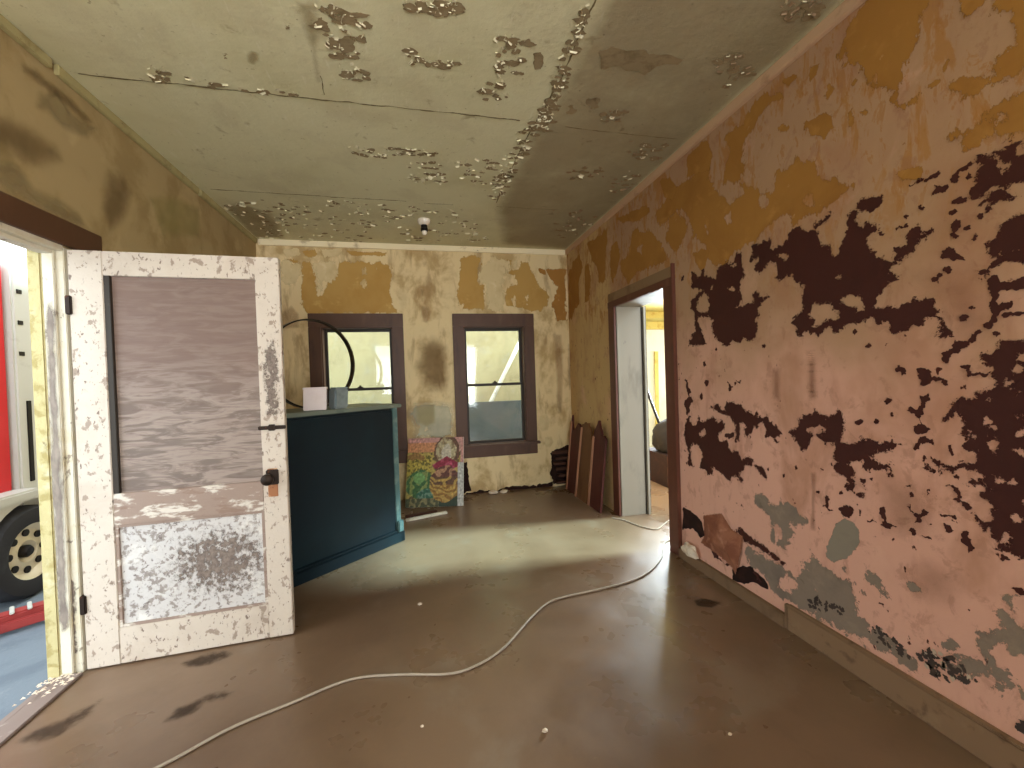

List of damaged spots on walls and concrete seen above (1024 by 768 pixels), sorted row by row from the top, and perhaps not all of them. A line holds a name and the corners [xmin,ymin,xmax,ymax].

peeling [308,3,373,82]
peeling [402,0,466,17]
peeling [348,3,629,200]
peeling [224,199,488,314]
damp [421,346,444,384]
peeling [456,0,1024,677]
flaking render [941,587,1024,700]